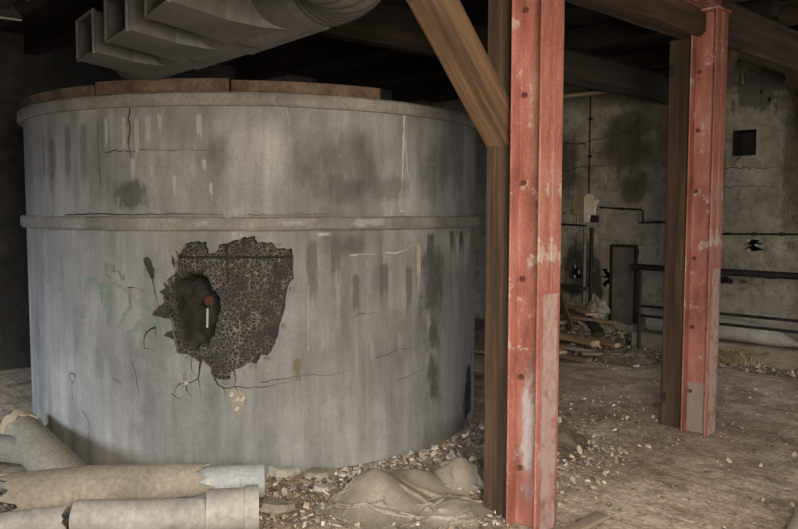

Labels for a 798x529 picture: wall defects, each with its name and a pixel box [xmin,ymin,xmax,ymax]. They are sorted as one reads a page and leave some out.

leakage [115,113,162,207]
crack [65,107,219,216]
leakage [399,115,411,212]
leakage [353,218,384,227]
leakage [307,233,376,291]
leakage [386,231,470,309]
spalling [143,236,294,417]
crack [171,360,355,399]
leakage [428,356,438,397]
leakage [463,364,471,419]